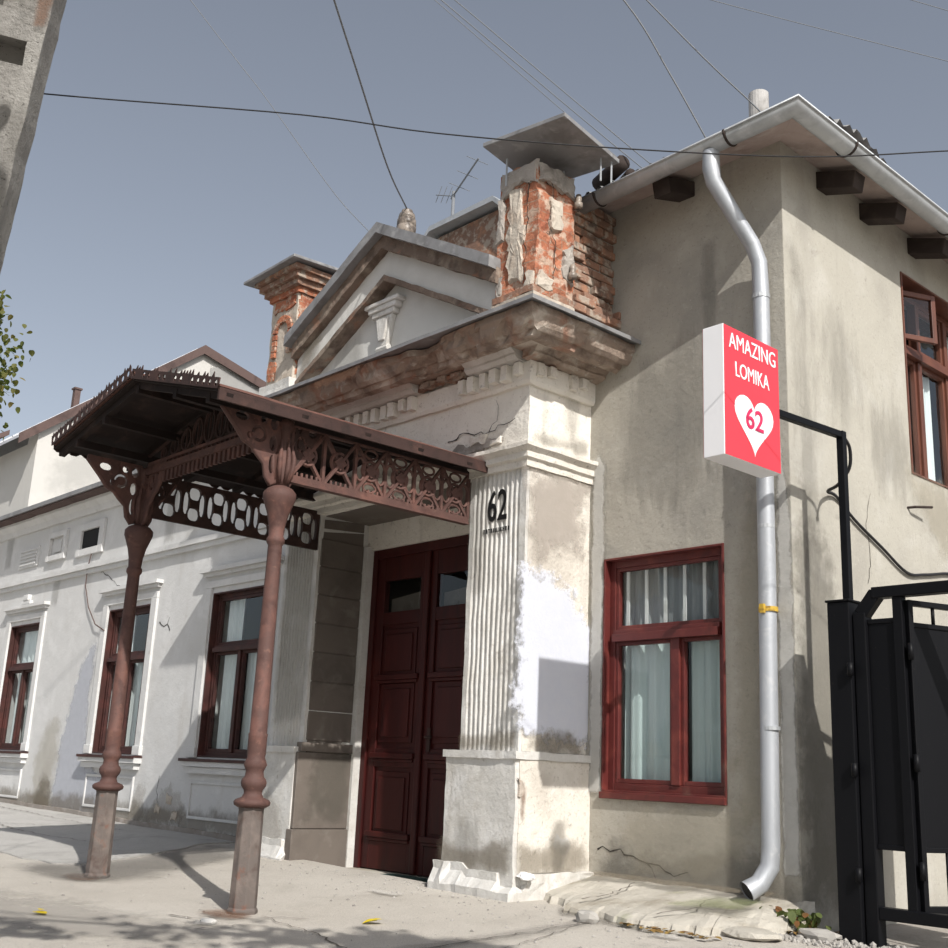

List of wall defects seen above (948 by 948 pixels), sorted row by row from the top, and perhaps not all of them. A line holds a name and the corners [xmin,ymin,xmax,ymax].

peeling [495,158,575,305]
spalling [274,293,314,318]
spalling [267,362,277,383]
crack [448,401,515,443]
crack [581,846,688,899]